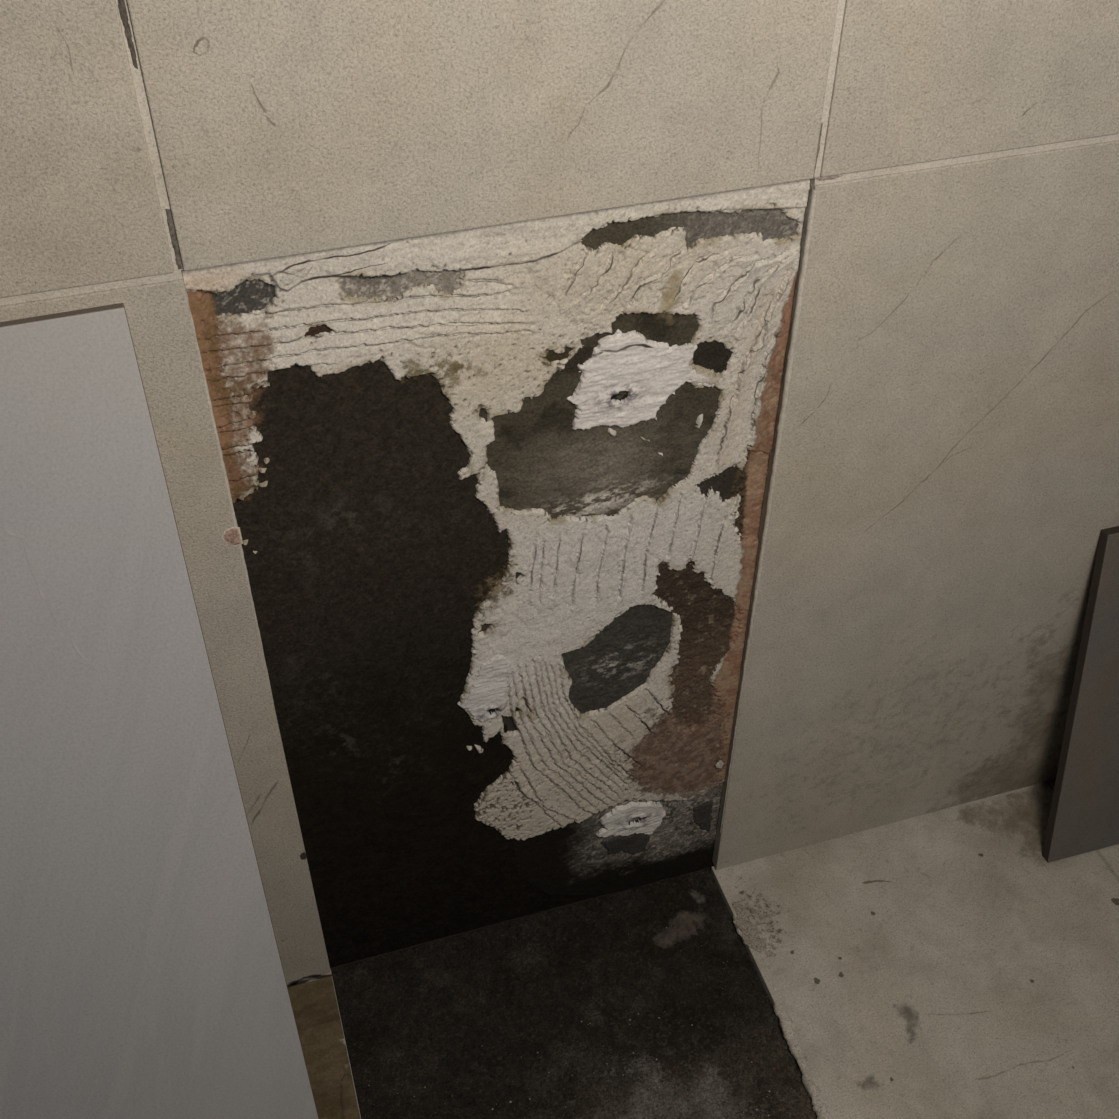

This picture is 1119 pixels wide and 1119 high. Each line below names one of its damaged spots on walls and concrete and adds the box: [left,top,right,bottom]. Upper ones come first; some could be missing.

spalling [581,208,799,250]
spalling [205,279,275,316]
spalling [337,268,461,300]
spalling [304,324,332,337]
spalling [483,312,748,520]
peeling [221,527,258,554]
spalling [561,558,736,725]
spalling [511,782,723,896]